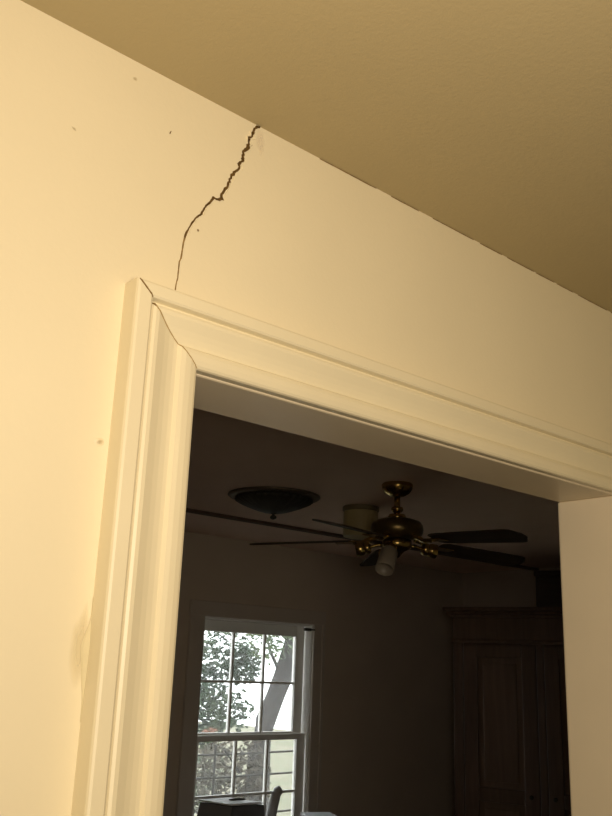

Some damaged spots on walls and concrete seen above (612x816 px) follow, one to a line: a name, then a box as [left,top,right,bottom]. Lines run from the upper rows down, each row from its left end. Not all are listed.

crack [175,125,260,290]
crack [140,278,197,369]